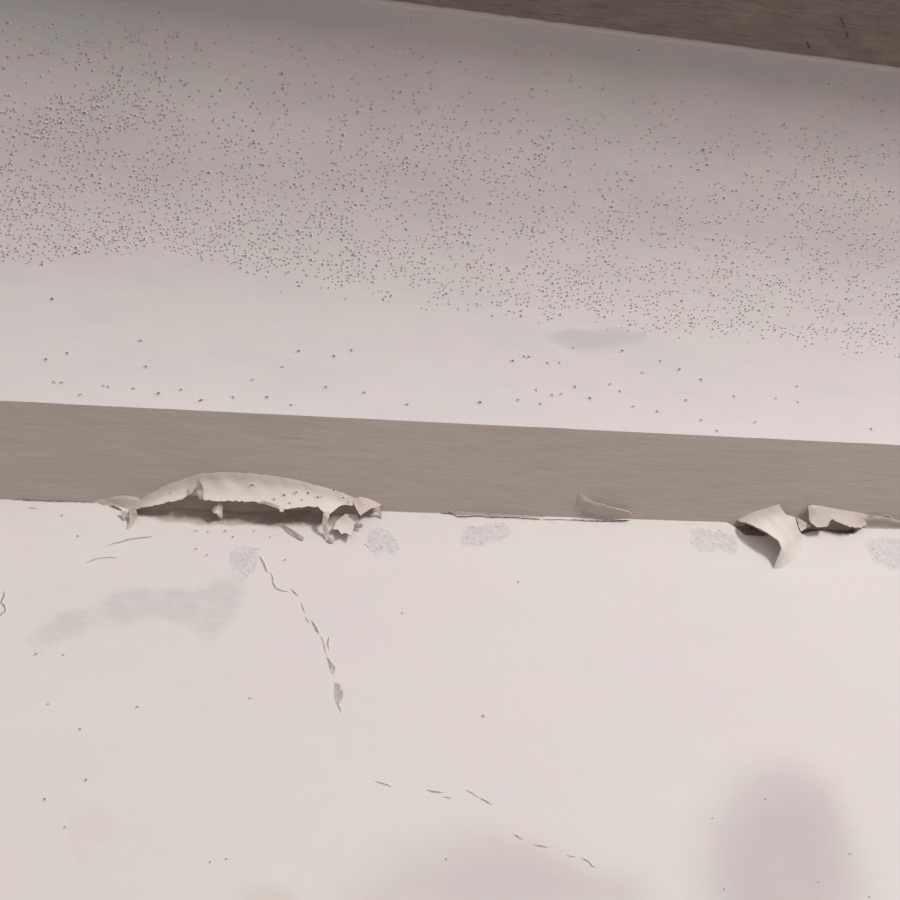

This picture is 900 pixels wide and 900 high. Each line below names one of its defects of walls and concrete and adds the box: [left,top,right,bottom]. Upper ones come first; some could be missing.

spalling [92,495,400,556]
peeling [572,494,632,519]
peeling [689,505,900,571]
crack [259,556,330,655]
crack [427,790,492,805]
crack [513,834,596,868]